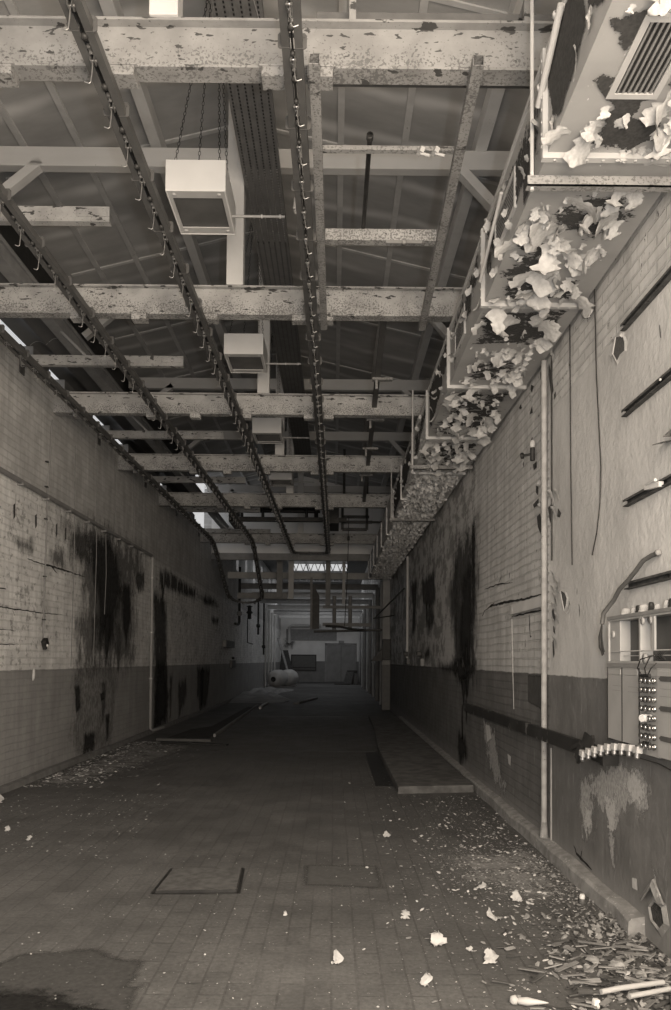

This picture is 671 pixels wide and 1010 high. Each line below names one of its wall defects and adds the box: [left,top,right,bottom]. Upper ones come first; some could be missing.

peeling [392,0,671,515]
crack [0,588,62,645]
damp [53,523,144,672]
damp [153,587,210,727]
peeling [359,778,670,1010]
damp [0,949,142,1010]